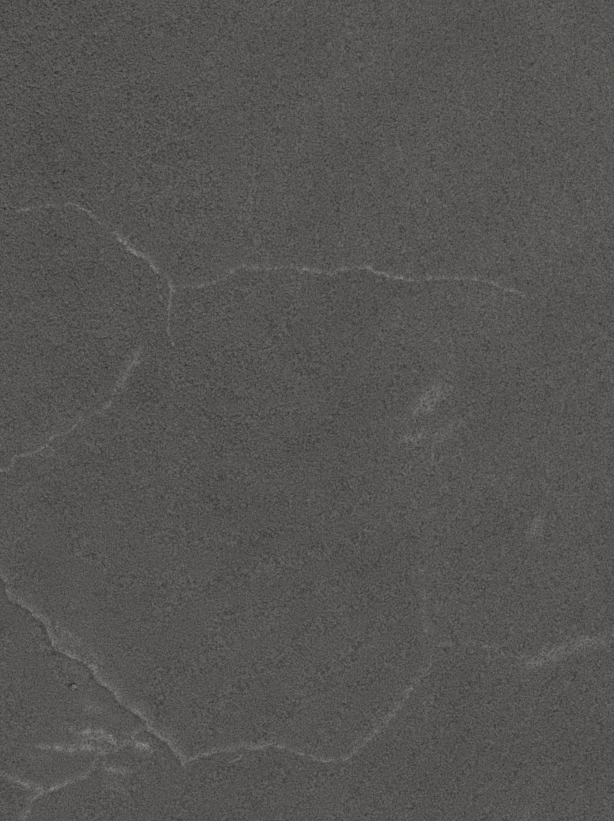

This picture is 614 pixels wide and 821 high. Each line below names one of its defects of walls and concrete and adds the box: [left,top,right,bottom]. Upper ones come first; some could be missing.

crack [13,201,530,351]